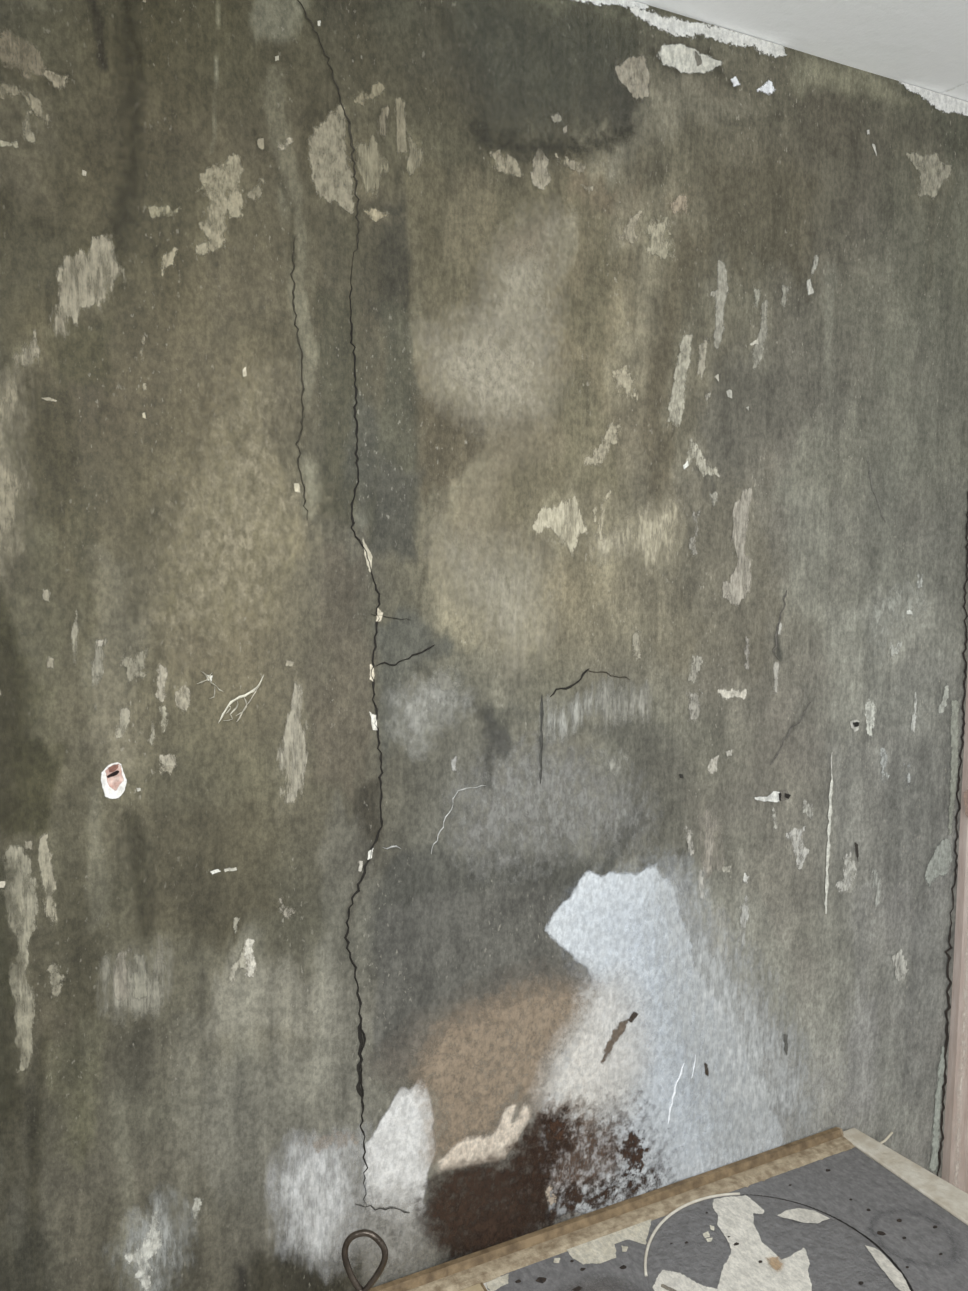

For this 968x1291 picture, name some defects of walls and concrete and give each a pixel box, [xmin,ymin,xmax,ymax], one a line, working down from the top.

peeling [658,44,722,74]
peeling [757,80,776,94]
peeling [364,208,388,222]
crack [290,238,308,514]
crack [297,0,434,1213]
crack [550,669,630,697]
leakage [865,699,890,783]
leakage [38,833,58,921]
leakage [47,963,65,996]
peeling [540,865,807,1217]
peeling [272,1078,435,1275]
leakage [124,1212,162,1291]